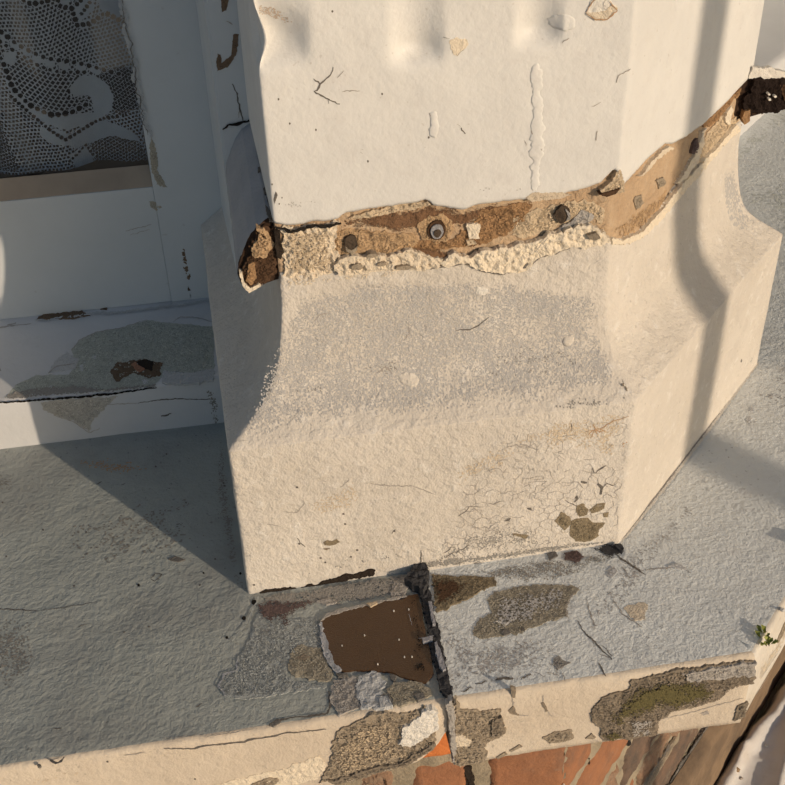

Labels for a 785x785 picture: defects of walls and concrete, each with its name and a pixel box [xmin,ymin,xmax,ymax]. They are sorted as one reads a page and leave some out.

crack [314,70,358,105]
spalling [280,88,741,282]
corrosion [414,202,533,258]
crack [0,387,208,417]
peeling [5,320,215,432]
crack [442,416,691,576]
spalling [554,503,609,542]
crack [1,602,95,611]
spalling [431,574,497,613]
peeling [215,577,439,785]
spalling [585,659,757,742]
spalling [543,729,574,744]